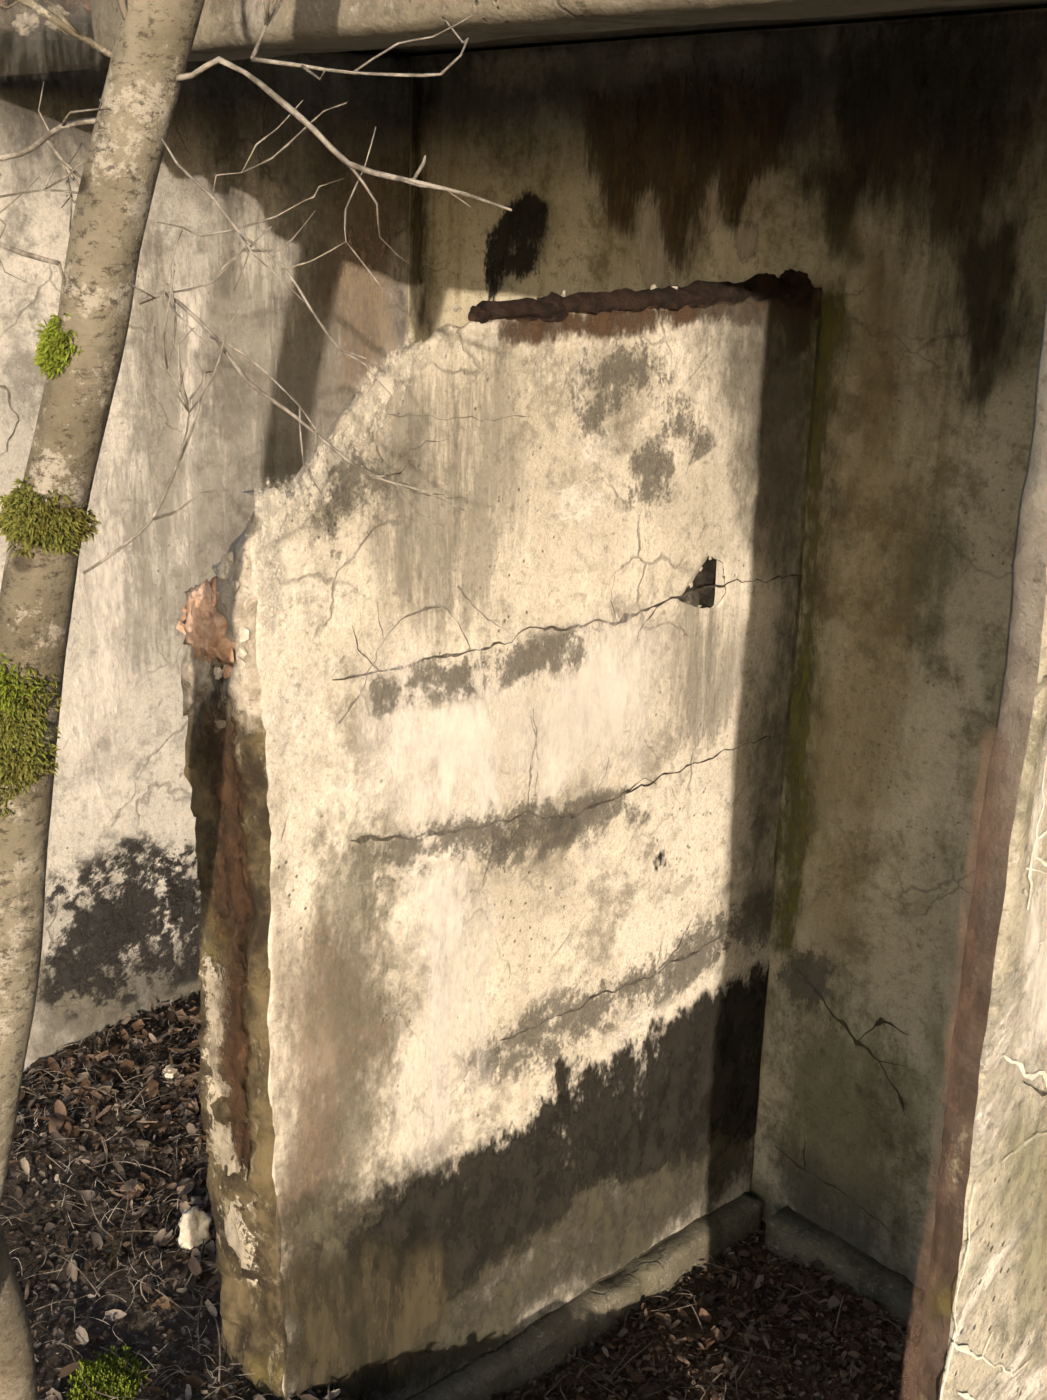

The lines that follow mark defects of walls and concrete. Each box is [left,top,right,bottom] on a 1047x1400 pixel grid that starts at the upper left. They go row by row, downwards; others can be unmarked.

leakage [582,68,792,275]
rust [498,287,822,353]
spalling [176,551,249,686]
crack [332,572,800,754]
leakage [468,306,812,1081]
spalling [667,540,735,624]
crack [350,709,786,844]
leakage [35,951,201,1058]
crack [1003,1054,1047,1096]
leakage [278,1149,474,1296]
leakage [364,1112,755,1400]
crack [940,1187,1031,1400]